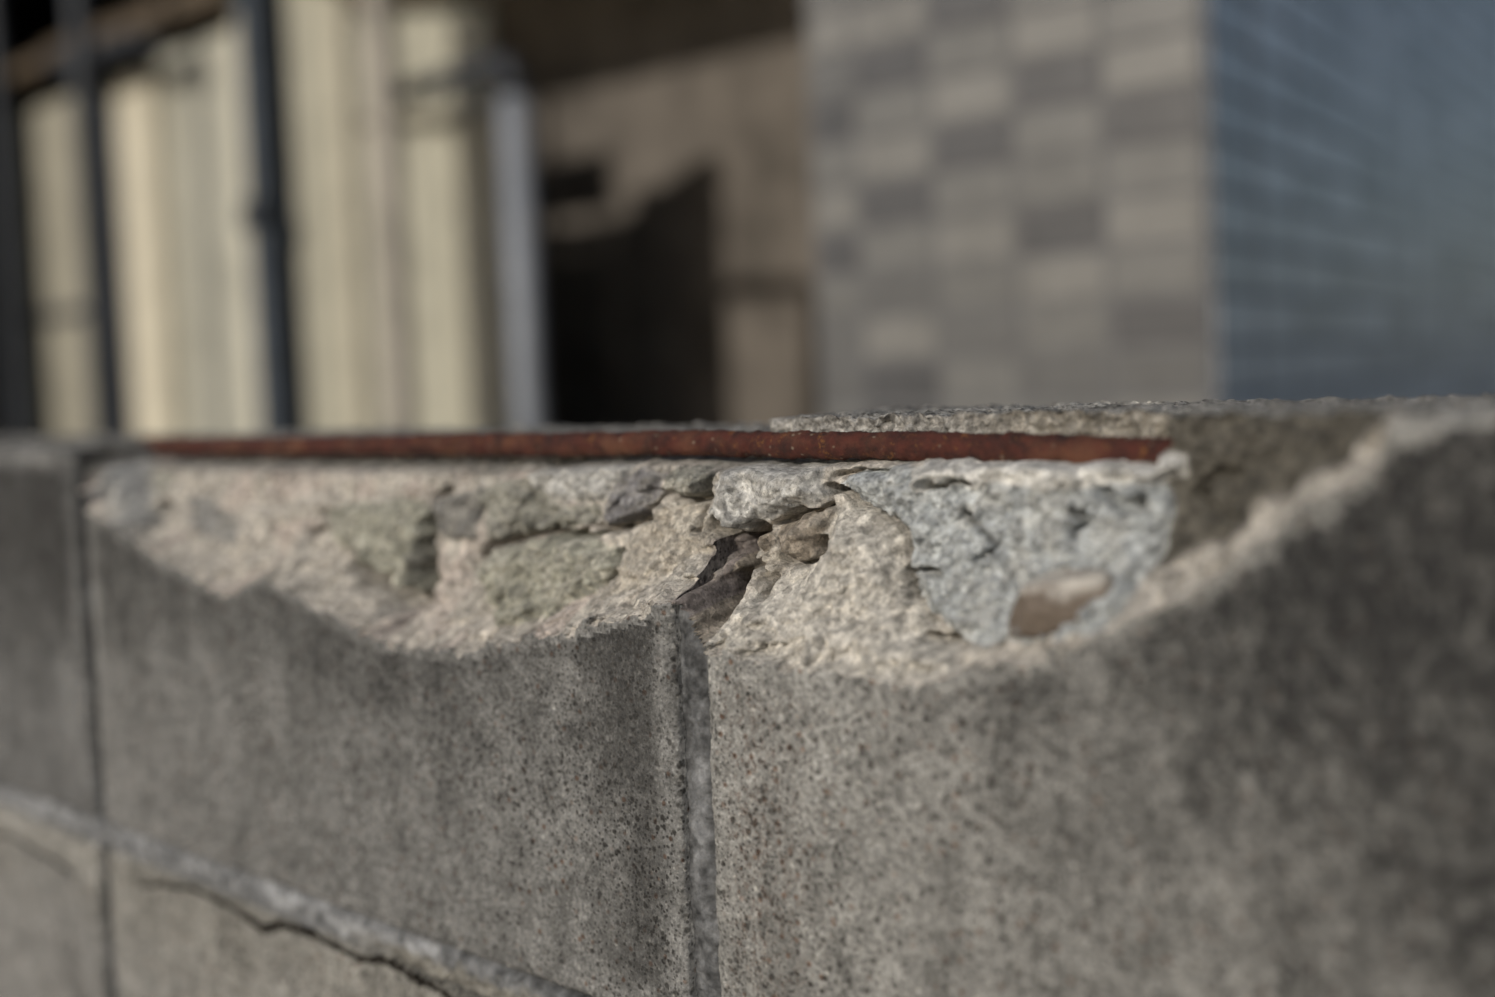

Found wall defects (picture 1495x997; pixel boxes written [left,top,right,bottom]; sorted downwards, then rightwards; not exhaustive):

corrosion [140,429,1173,464]
spalling [78,409,1402,687]
crack [139,882,452,997]